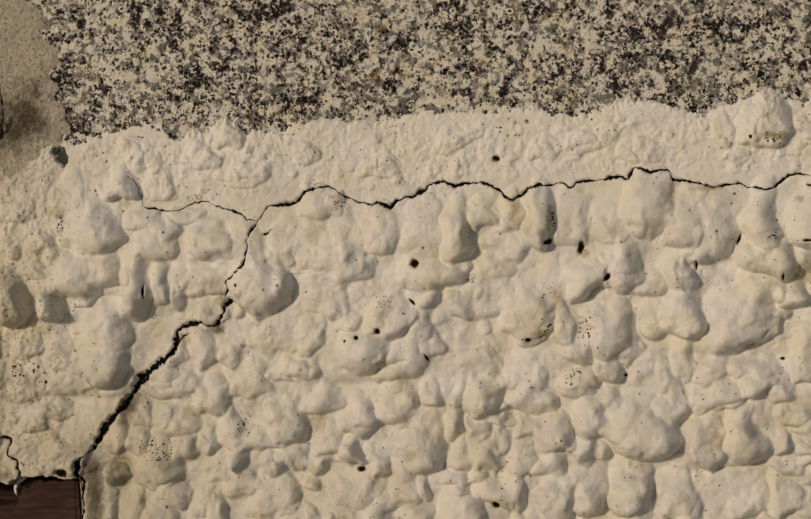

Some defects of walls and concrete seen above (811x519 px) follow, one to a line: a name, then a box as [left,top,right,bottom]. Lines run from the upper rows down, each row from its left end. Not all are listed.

crack [0,85,13,139]
crack [73,167,811,519]
crack [0,436,26,477]